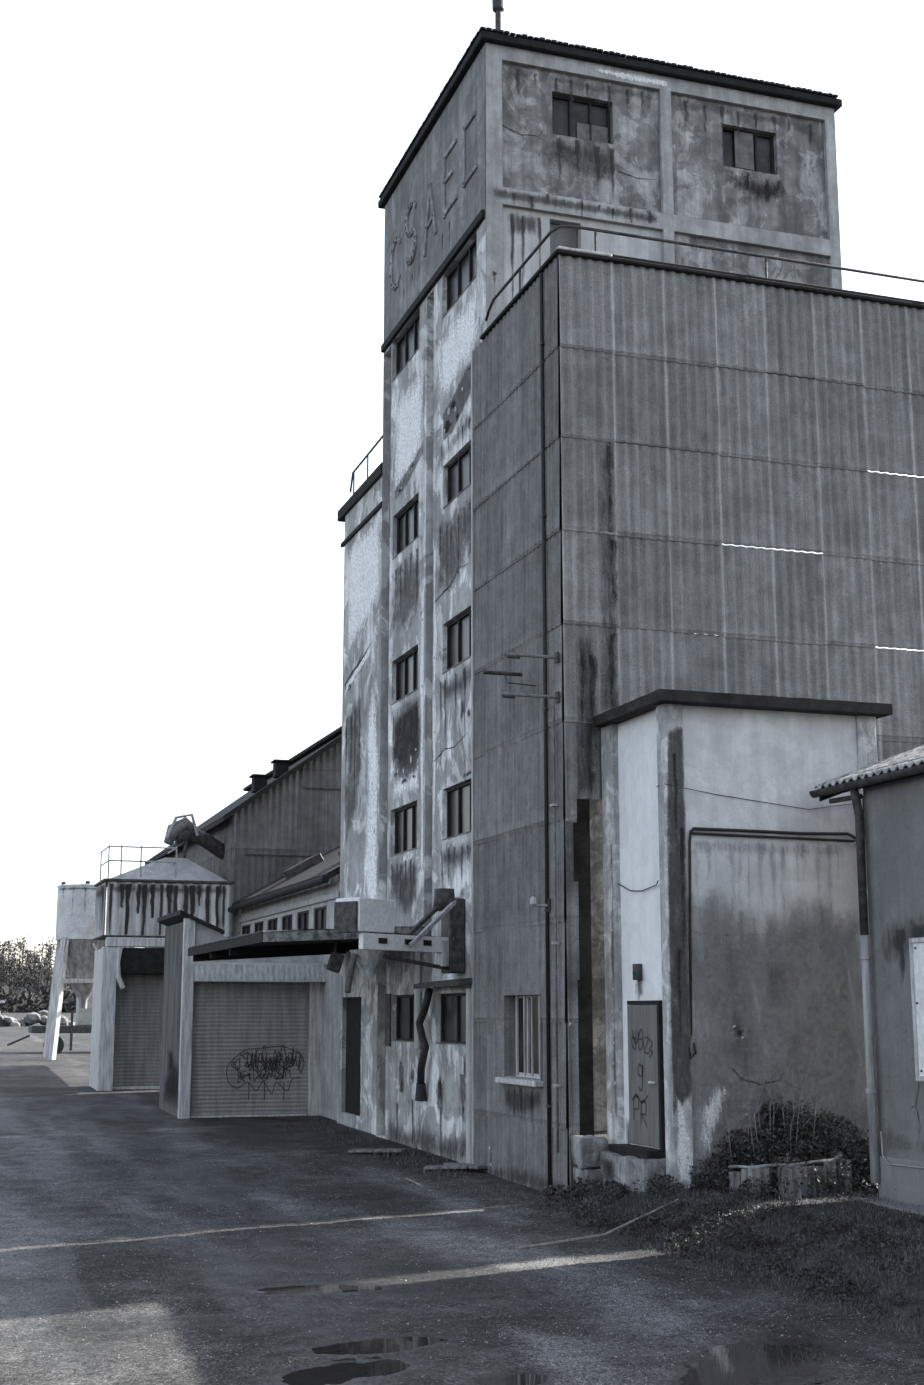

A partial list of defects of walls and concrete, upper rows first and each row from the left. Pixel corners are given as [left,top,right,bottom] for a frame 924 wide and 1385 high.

water stain [555,78,652,113]
water stain [678,100,815,142]
water stain [557,138,614,191]
water stain [735,174,785,201]
water stain [496,191,656,296]
water stain [580,446,617,789]
water stain [393,700,419,763]